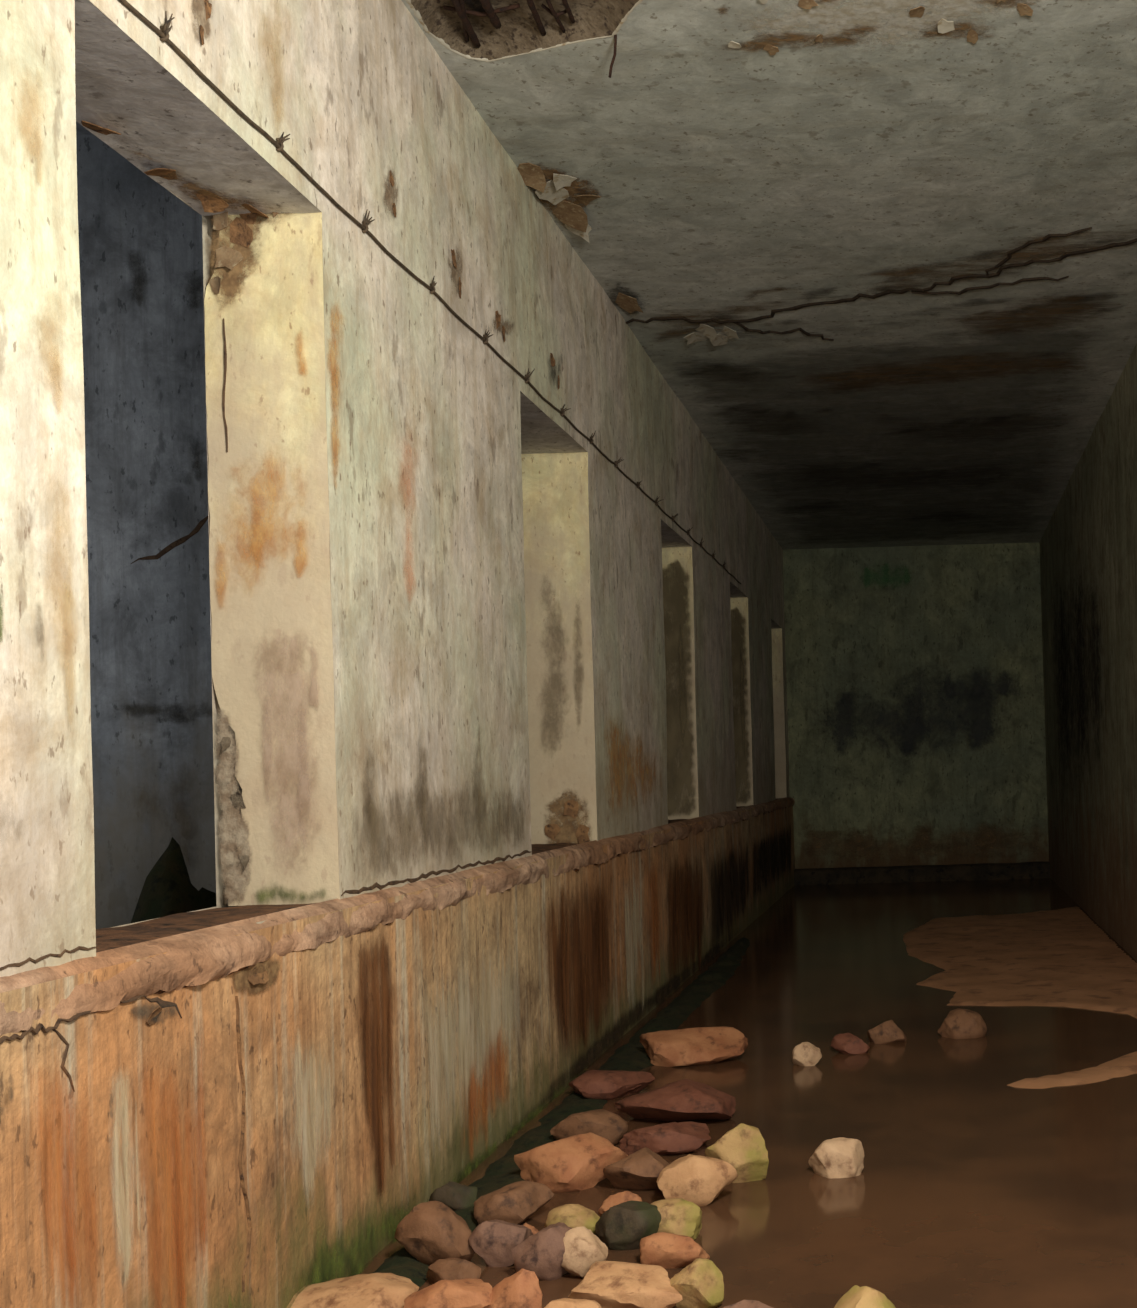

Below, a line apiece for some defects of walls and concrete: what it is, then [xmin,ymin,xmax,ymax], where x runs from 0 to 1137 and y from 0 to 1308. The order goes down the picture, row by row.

spalling [406,0,643,78]
peeling [728,0,1033,55]
spalling [81,120,121,135]
spalling [133,151,278,303]
spalling [517,163,601,243]
crack [626,227,1137,341]
crack [131,516,208,564]
rust [238,464,306,575]
spalling [216,710,251,904]
spalling [545,792,590,844]
crack [0,946,96,971]
crack [0,995,182,1092]